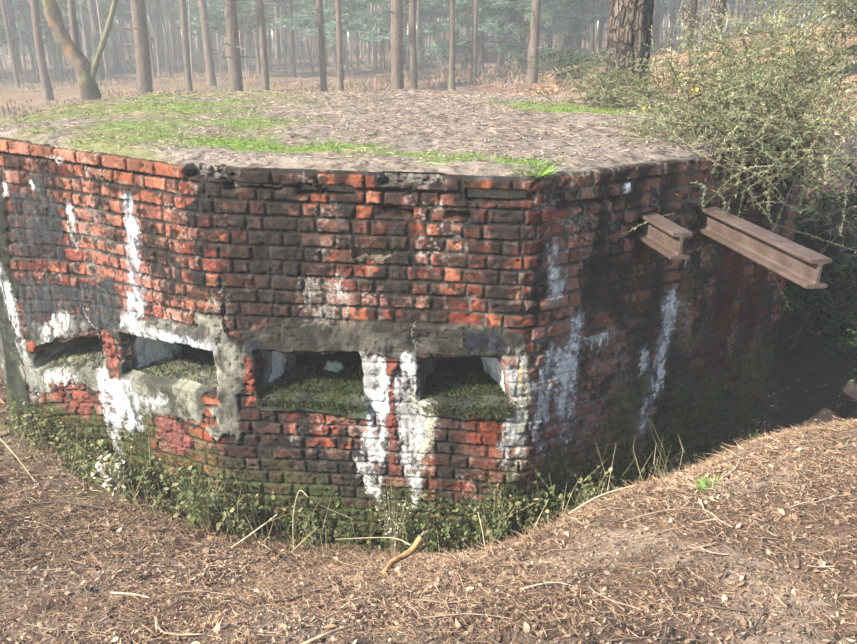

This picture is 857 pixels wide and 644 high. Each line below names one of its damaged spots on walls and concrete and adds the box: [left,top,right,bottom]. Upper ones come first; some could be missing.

water stain [0,267,77,398]
spalling [48,379,93,421]
spalling [101,329,120,381]
water stain [123,191,182,326]
spalling [155,415,195,456]
water stain [354,222,438,509]
water stain [496,312,615,481]
water stain [631,205,680,431]
water stain [683,199,724,337]